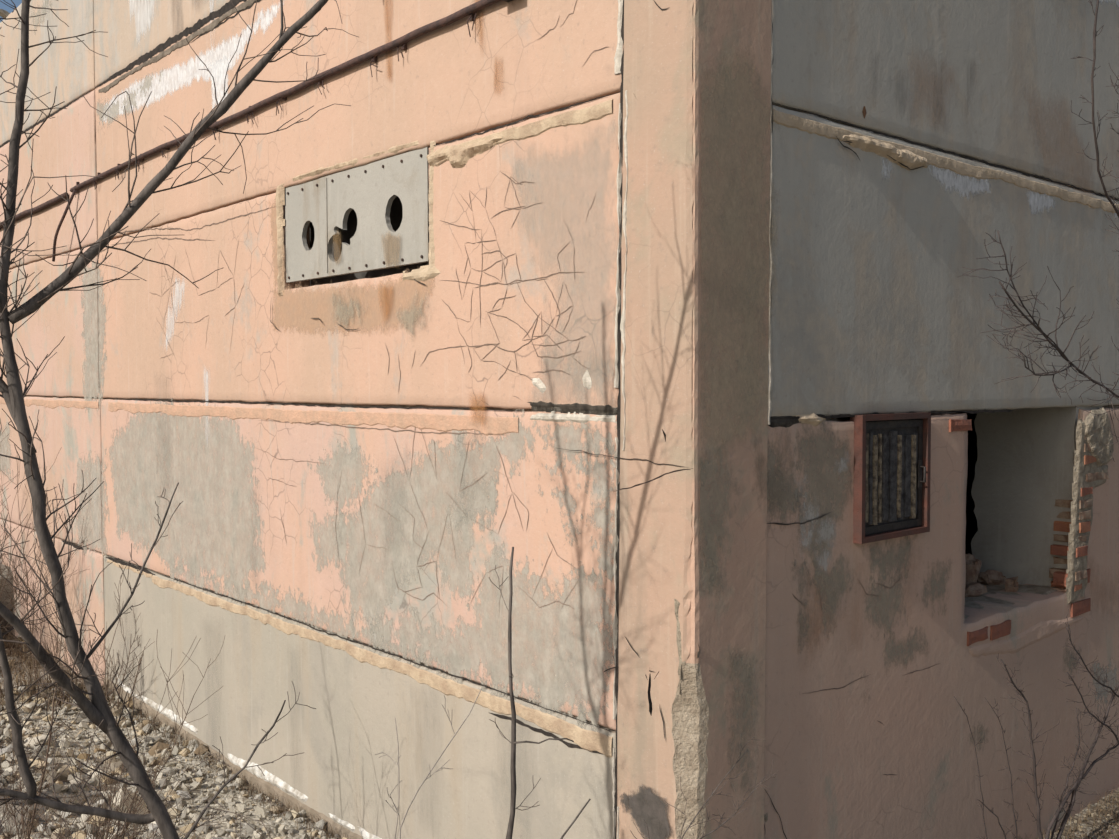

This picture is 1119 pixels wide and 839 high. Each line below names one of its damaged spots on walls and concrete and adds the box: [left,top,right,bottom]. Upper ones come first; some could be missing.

peeling [96,68,163,125]
crack [0,0,261,148]
peeling [79,257,107,413]
crack [59,0,694,839]
peeling [76,399,619,733]
flaking render [967,620,1011,646]
spalling [1049,407,1114,618]